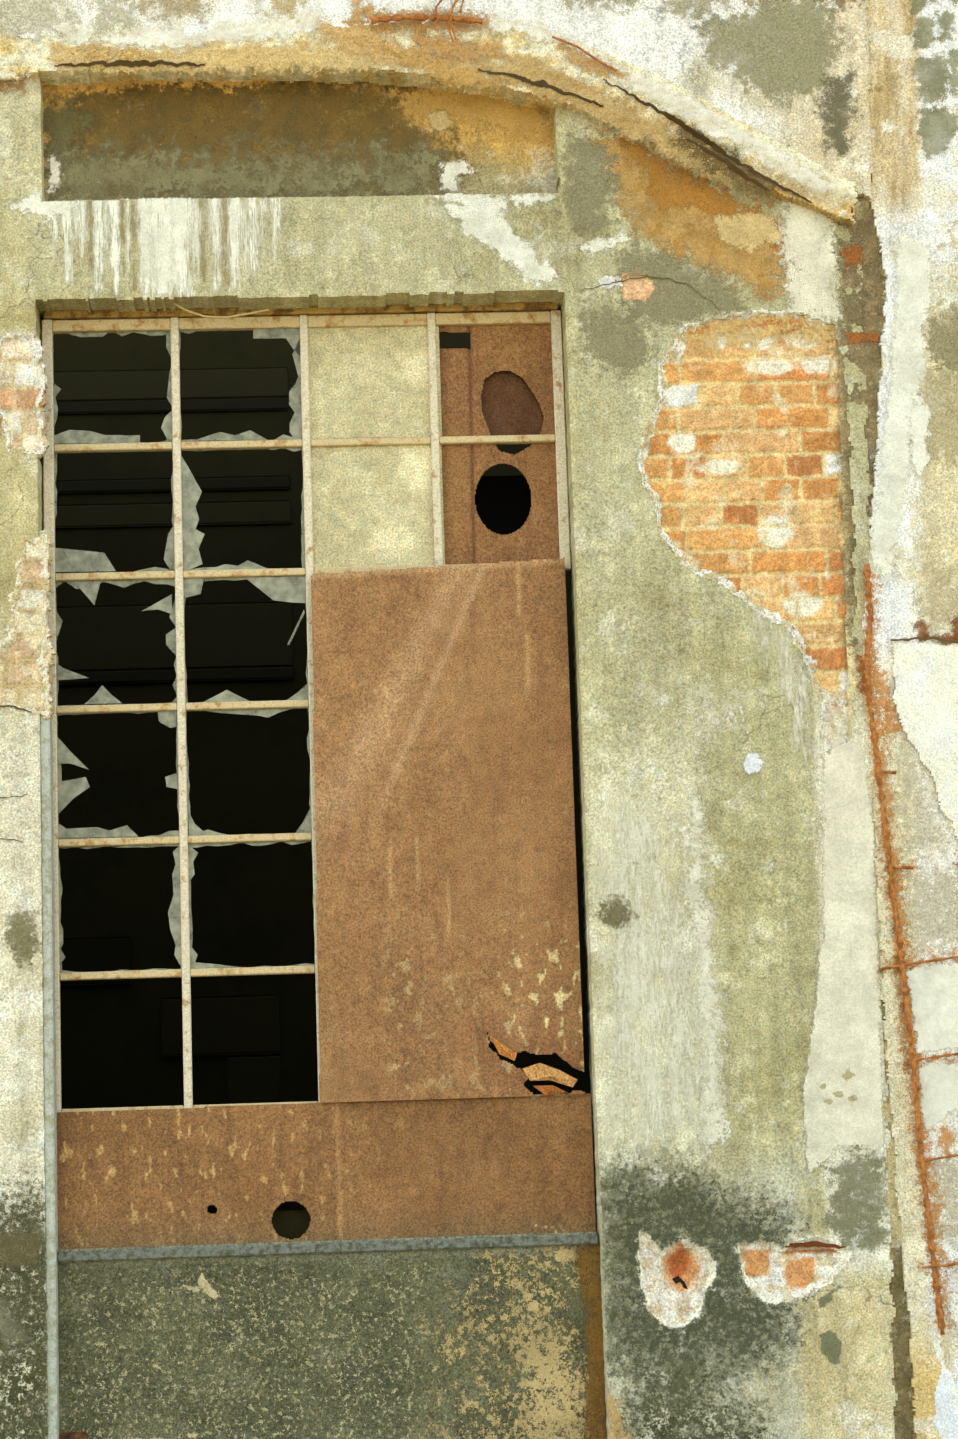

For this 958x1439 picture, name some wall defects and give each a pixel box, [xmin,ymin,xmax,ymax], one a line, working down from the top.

rust [349,0,512,64]
rust [552,36,630,80]
flaking render [0,331,50,459]
damp [0,78,958,656]
rust [844,329,880,345]
crack [0,705,32,713]
flaking render [0,529,56,720]
damp [754,609,818,762]
flaking render [634,308,958,1439]
rust [855,569,958,1329]
damp [594,685,915,1439]
damp [0,1168,49,1439]